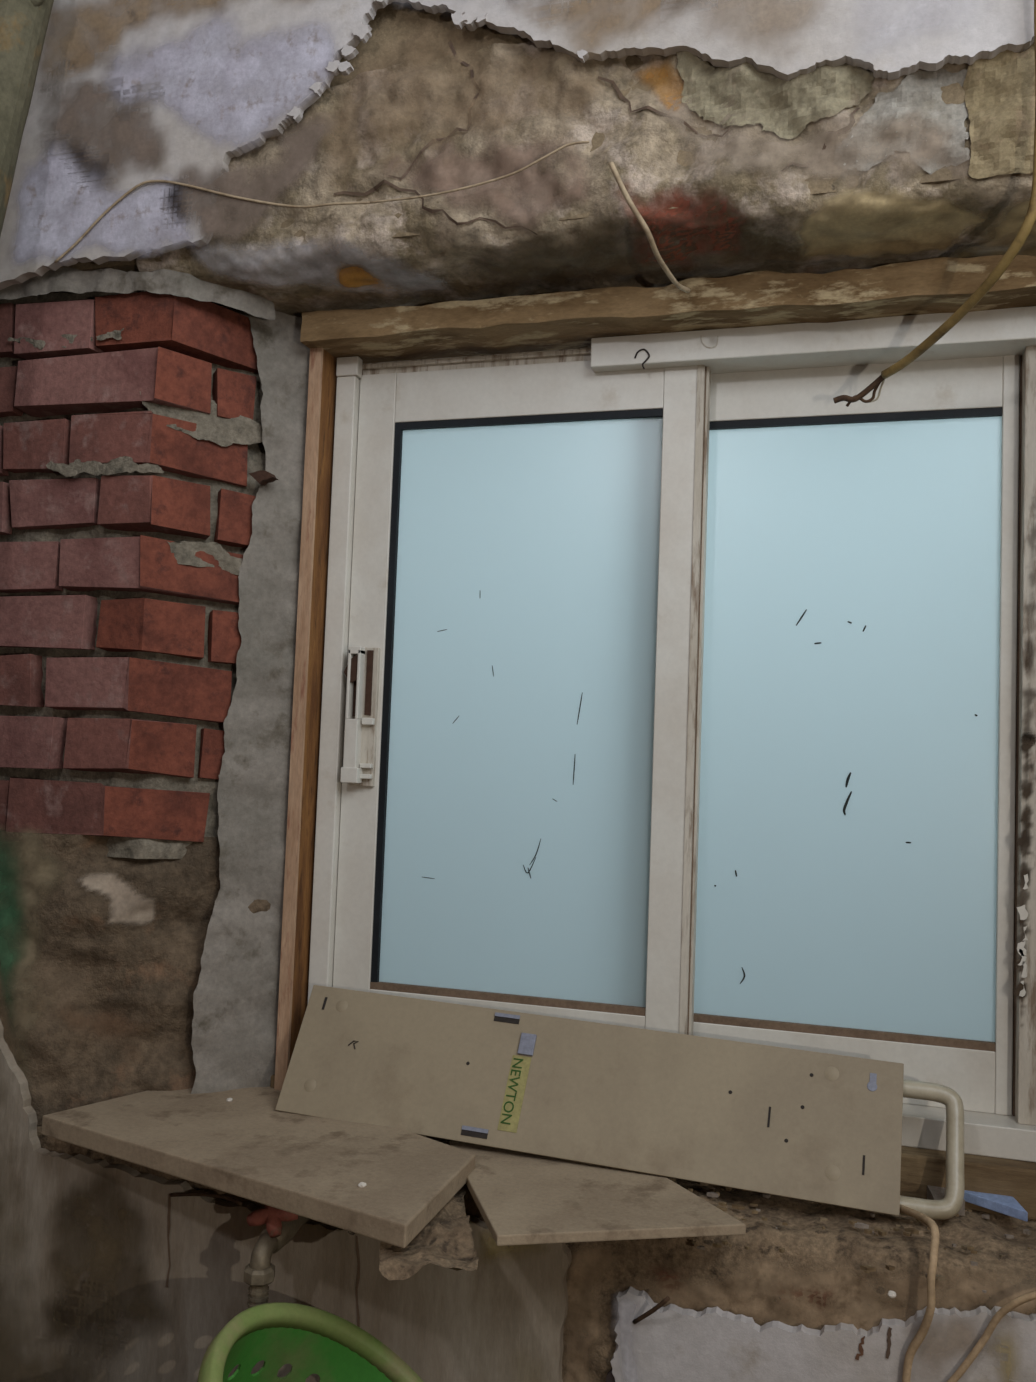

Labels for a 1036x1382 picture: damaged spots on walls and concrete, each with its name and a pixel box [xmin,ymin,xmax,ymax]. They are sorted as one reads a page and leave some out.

peeling [451,11,487,29]
water stain [543,0,682,47]
peeling [309,24,372,97]
water stain [14,0,513,262]
peeling [286,106,304,123]
crack [334,40,537,235]
crack [598,76,731,138]
peeling [963,43,1035,179]
water stain [412,136,784,289]
flaking render [633,192,745,264]
spalling [927,1185,946,1200]
peeling [650,1259,1036,1331]